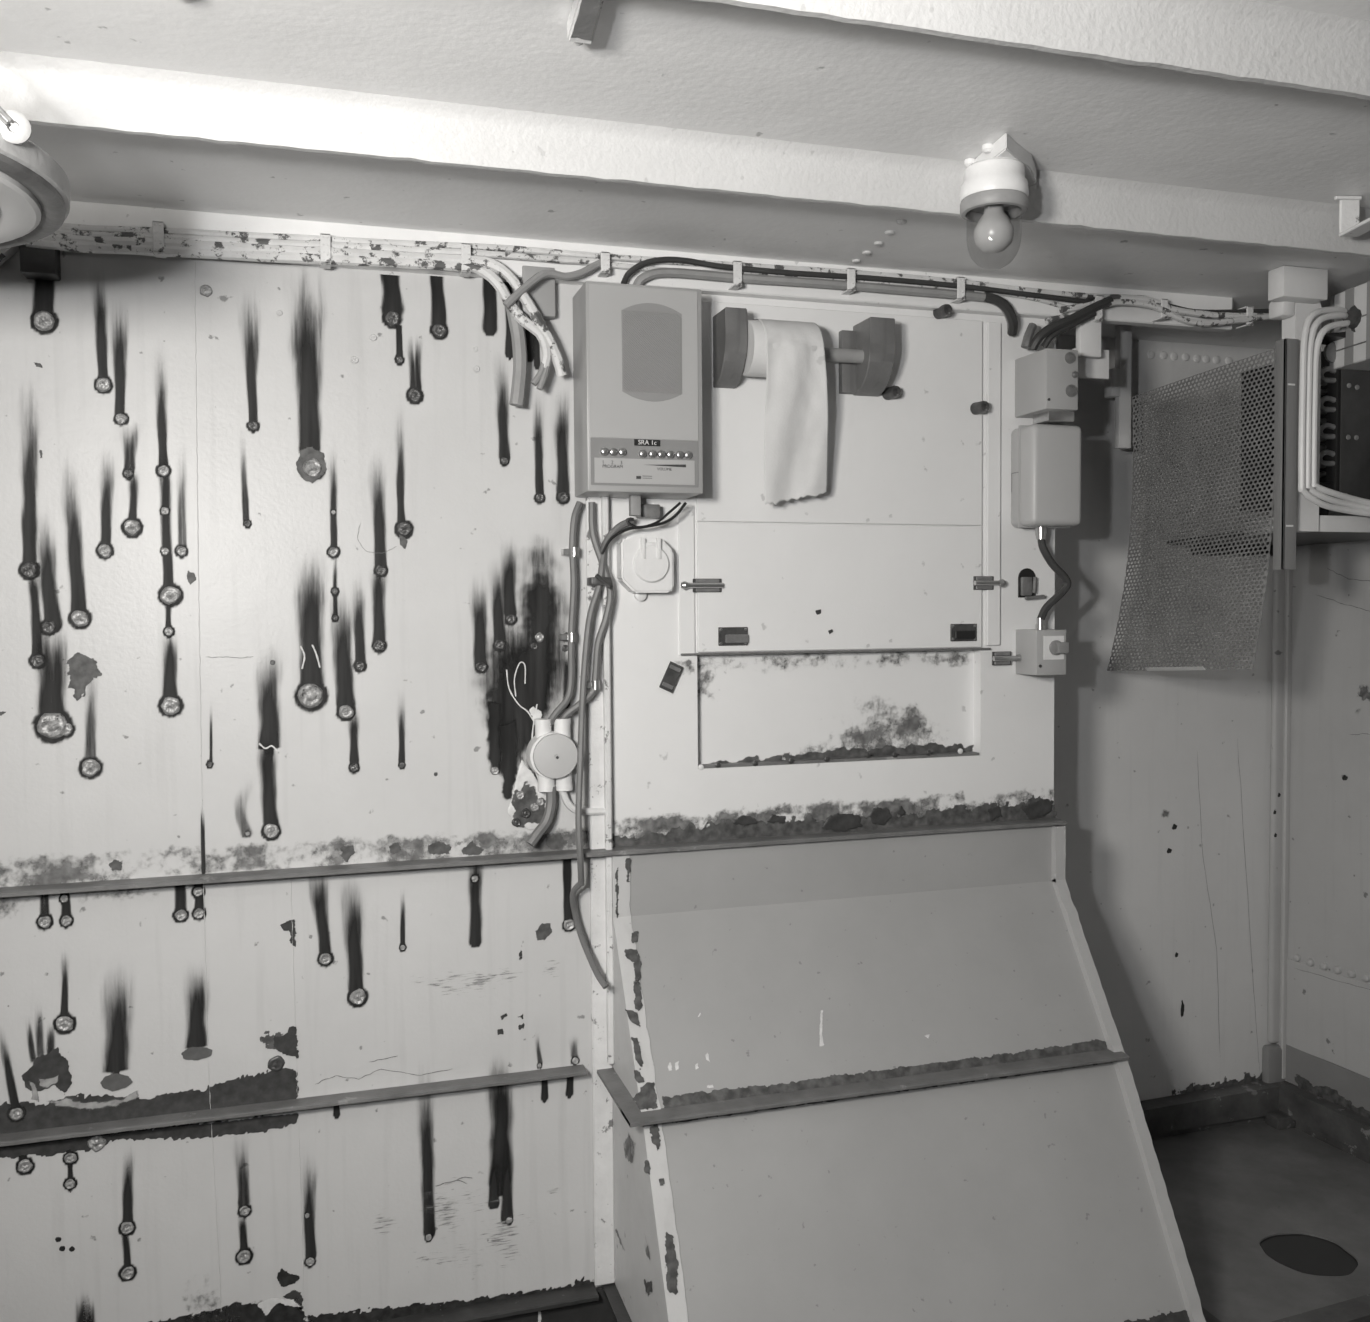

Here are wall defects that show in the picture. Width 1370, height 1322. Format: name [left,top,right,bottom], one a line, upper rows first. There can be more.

corrosion [67,652,102,701]
peeling [615,858,631,918]
corrosion [280,920,297,947]
corrosion [535,923,552,940]
peeling [22,1021,138,1110]
peeling [624,931,1108,1186]
corrosion [1172,1072,1262,1096]
corrosion [1295,1074,1370,1119]
peeling [665,1232,679,1295]
peeling [258,1269,303,1315]
peeling [1124,1310,1190,1322]